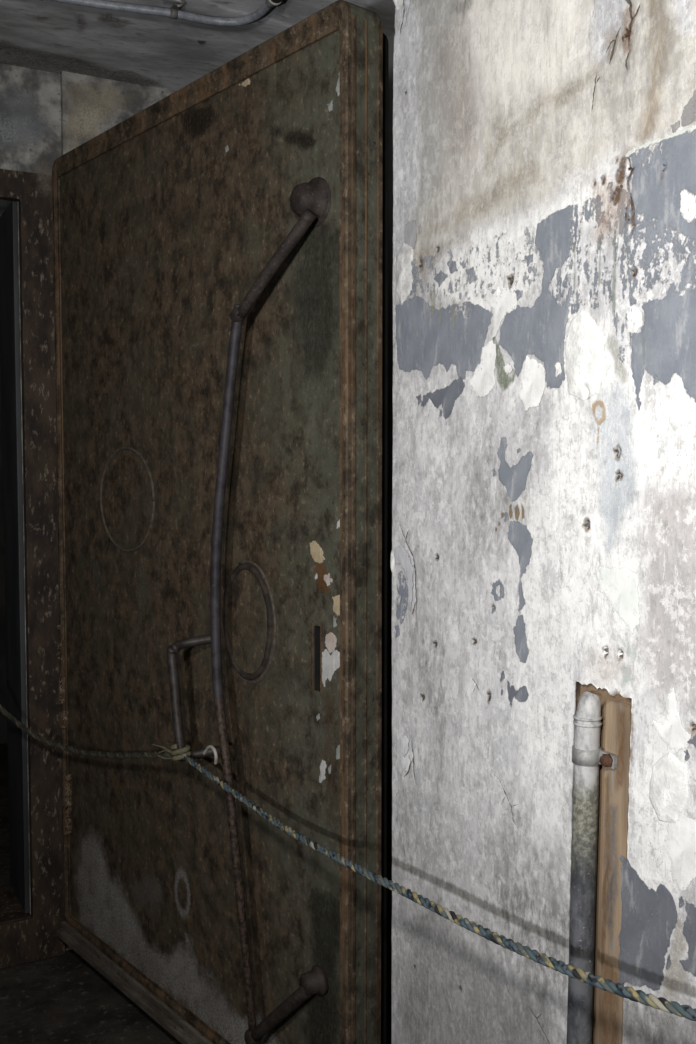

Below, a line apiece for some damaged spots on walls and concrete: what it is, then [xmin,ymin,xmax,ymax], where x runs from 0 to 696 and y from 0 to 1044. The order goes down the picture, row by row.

crack [592,0,640,109]
peeling [395,90,696,419]
peeling [491,580,504,613]
peeling [493,437,533,663]
flaking render [652,687,696,761]
peeling [618,814,696,991]